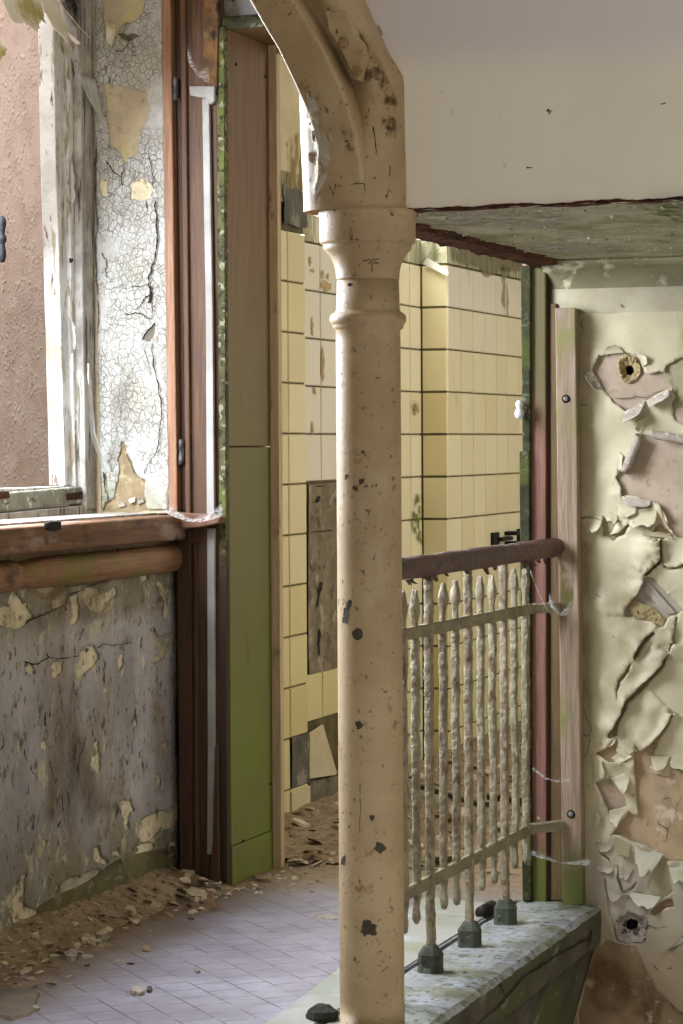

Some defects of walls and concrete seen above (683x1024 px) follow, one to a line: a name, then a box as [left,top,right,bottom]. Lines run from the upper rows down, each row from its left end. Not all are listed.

peeling [2,0,88,45]
crack [94,149,125,329]
crack [125,156,158,319]
corrosion [408,196,683,213]
crack [127,347,162,475]
flaking render [101,441,148,512]
flaking render [0,581,117,629]
crack [25,580,109,624]
crack [24,616,153,689]
peeling [578,345,683,1024]
spalling [292,724,339,802]
flaking render [61,800,179,893]